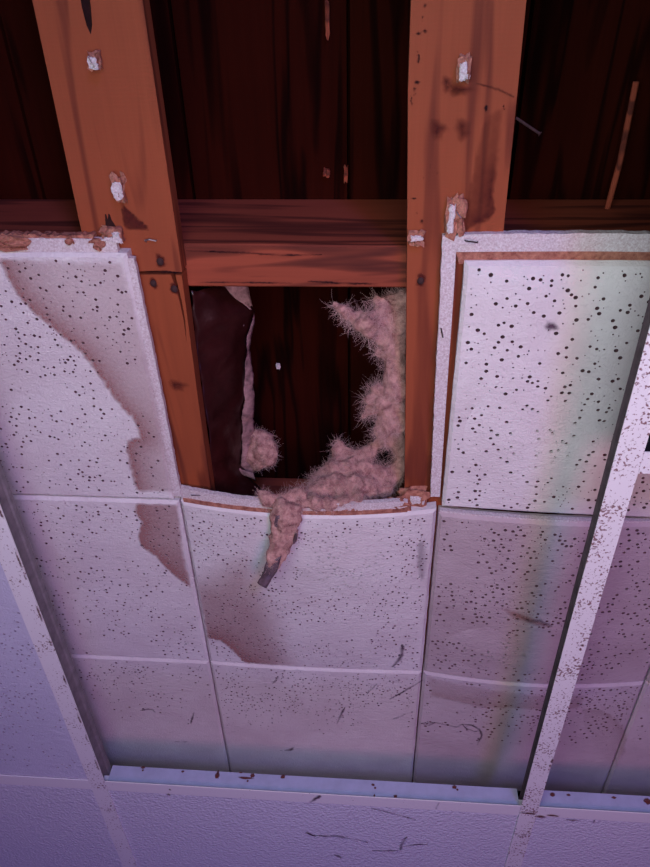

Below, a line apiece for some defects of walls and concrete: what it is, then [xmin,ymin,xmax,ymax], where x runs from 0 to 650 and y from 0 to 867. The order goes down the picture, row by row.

leakage [2,261,150,490]
leakage [137,504,189,584]